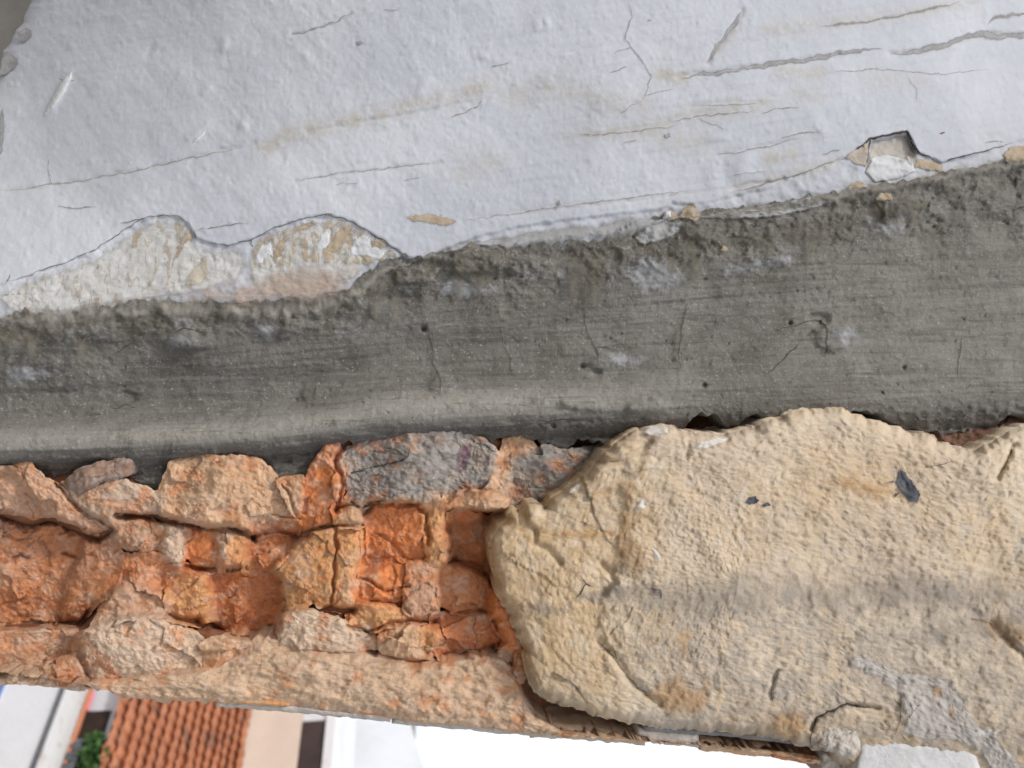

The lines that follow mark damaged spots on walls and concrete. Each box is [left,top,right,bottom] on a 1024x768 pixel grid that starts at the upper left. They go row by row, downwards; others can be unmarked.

crack [577,3,1007,189]
crack [6,148,237,209]
spalling [846,136,943,190]
peeling [0,219,396,314]